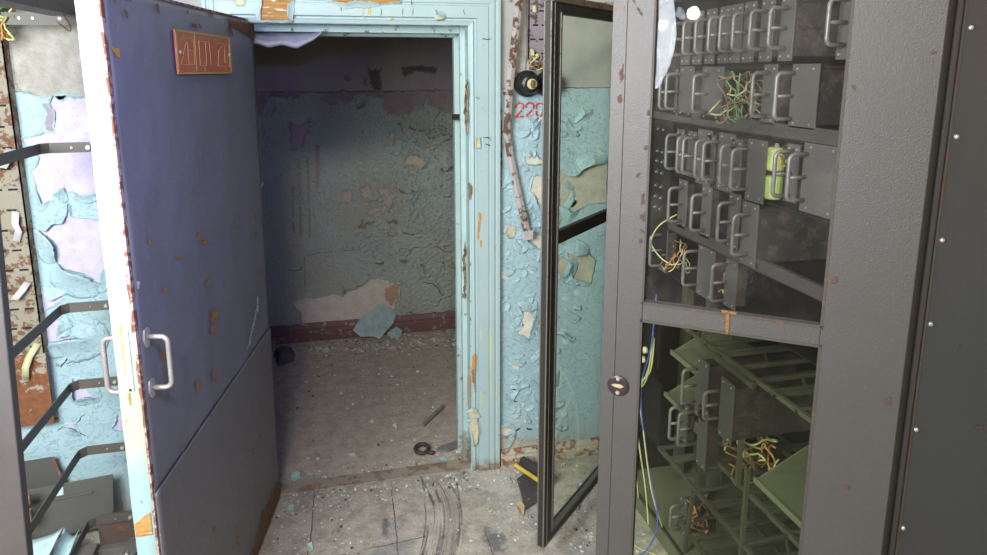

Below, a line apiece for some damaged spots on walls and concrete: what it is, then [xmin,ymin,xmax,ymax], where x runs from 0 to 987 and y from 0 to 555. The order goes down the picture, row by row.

peeling [326,0,403,9]
peeling [354,88,453,123]
peeling [561,108,594,138]
peeling [402,151,454,172]
peeling [6,25,110,363]
peeling [500,105,543,283]
peeling [559,150,608,223]
peeling [558,239,597,287]
flaking render [290,274,402,327]
peeling [64,376,102,406]
peeling [500,293,540,449]
peeling [109,413,123,432]